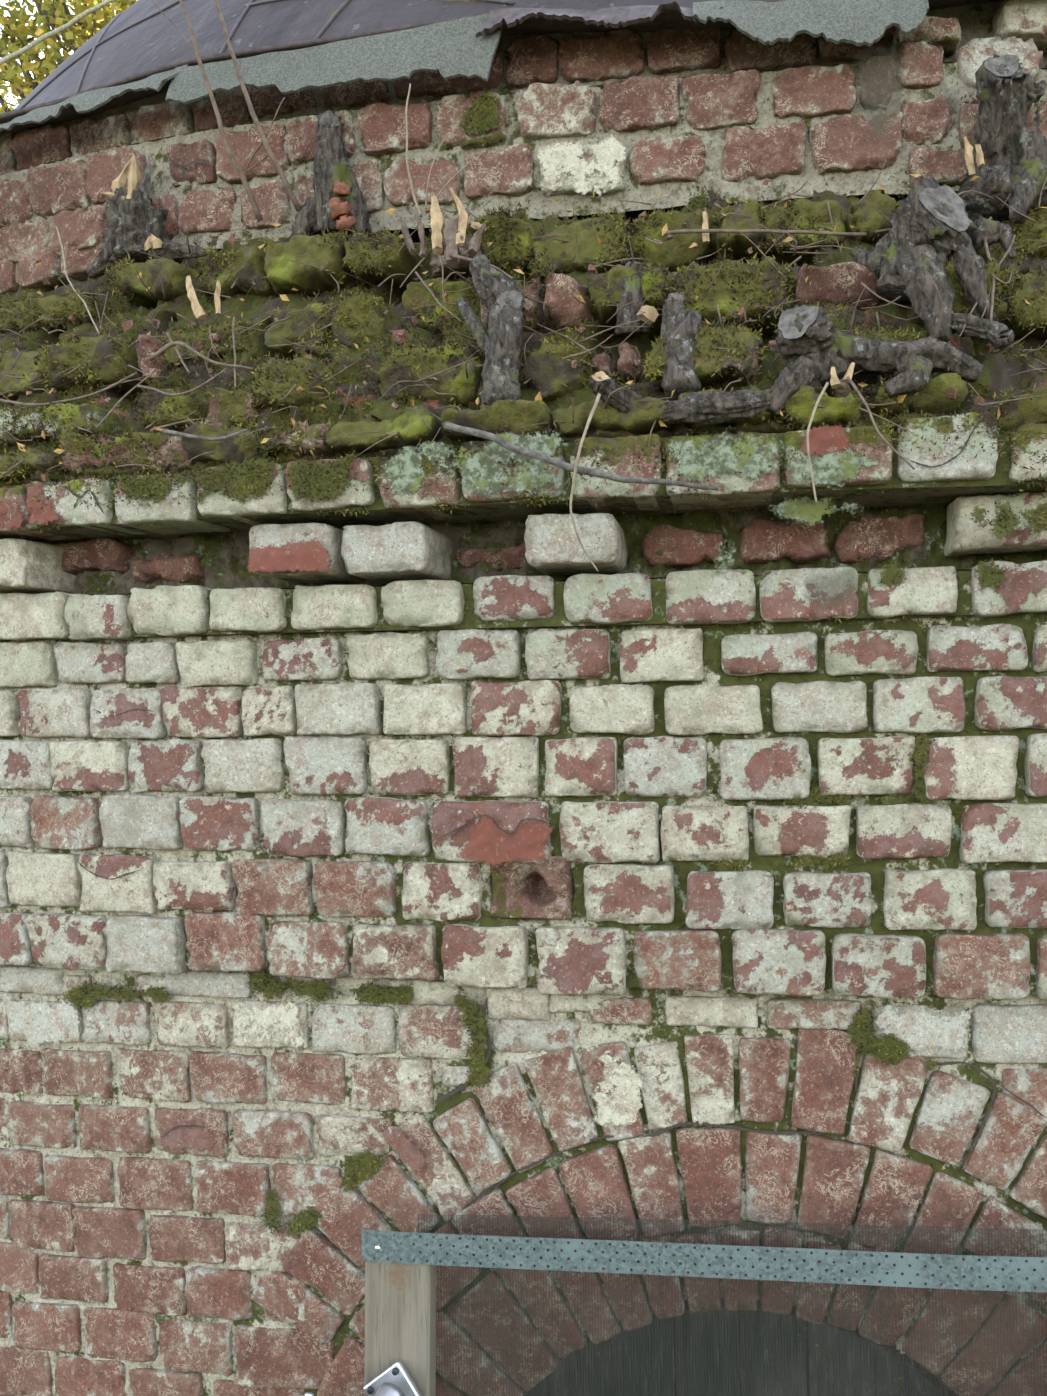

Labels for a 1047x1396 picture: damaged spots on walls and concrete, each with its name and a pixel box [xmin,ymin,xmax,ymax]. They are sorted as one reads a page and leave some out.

peeling [93,602,126,676]
peeling [3,689,50,778]
peeling [53,638,341,857]
spalling [293,514,1047,997]
peeling [80,855,151,885]
peeling [153,870,235,911]
peeling [0,914,105,970]